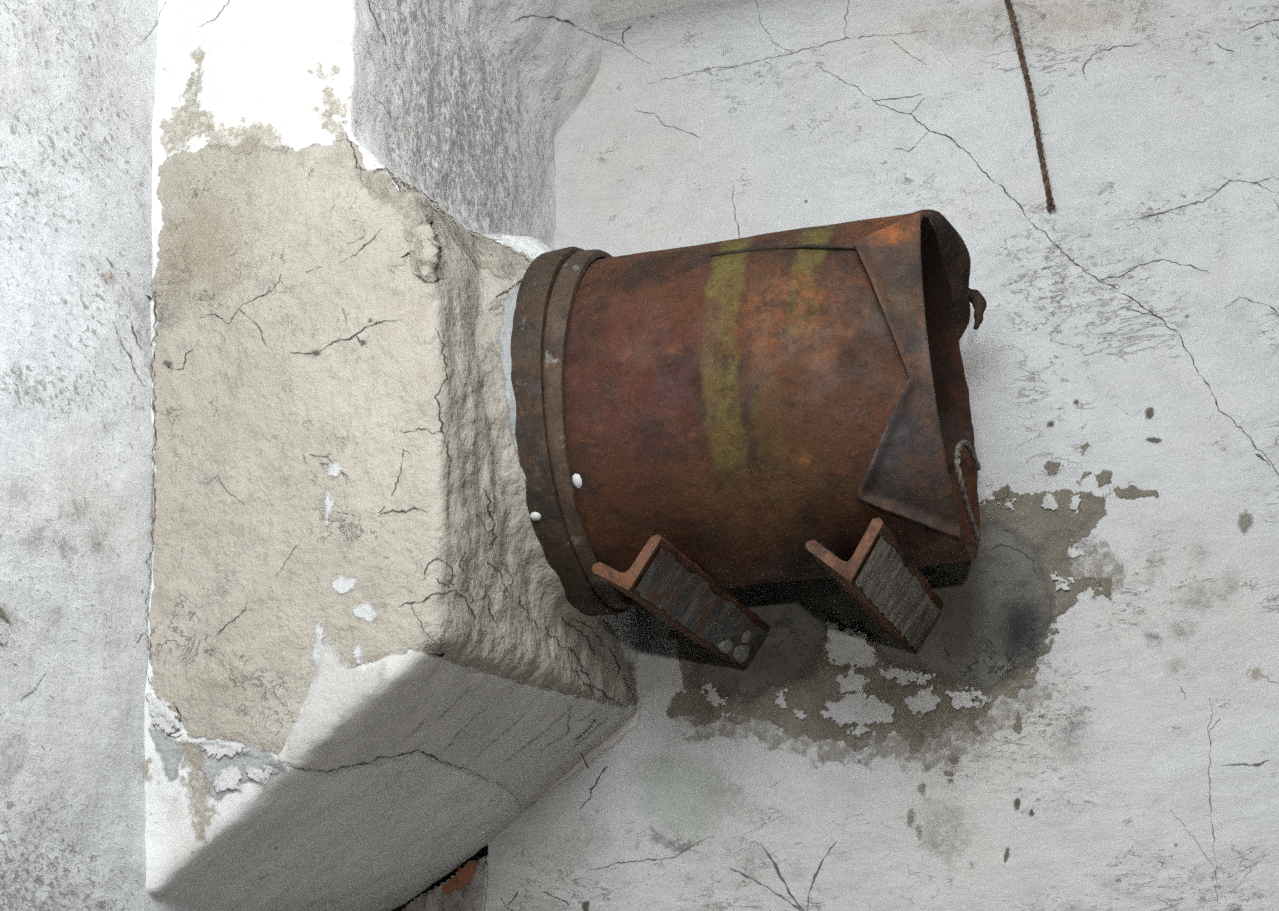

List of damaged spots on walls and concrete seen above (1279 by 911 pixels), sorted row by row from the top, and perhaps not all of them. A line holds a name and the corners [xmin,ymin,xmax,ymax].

crack [204,229,396,354]
crack [346,133,530,310]
crack [513,0,1279,475]
crack [115,294,193,684]
crack [310,328,453,515]
flaking render [142,49,639,844]
spalling [1044,461,1064,475]
crack [153,703,182,738]
crack [284,750,505,786]
crack [401,488,633,705]
crack [581,753,607,807]
spalling [666,470,1159,793]